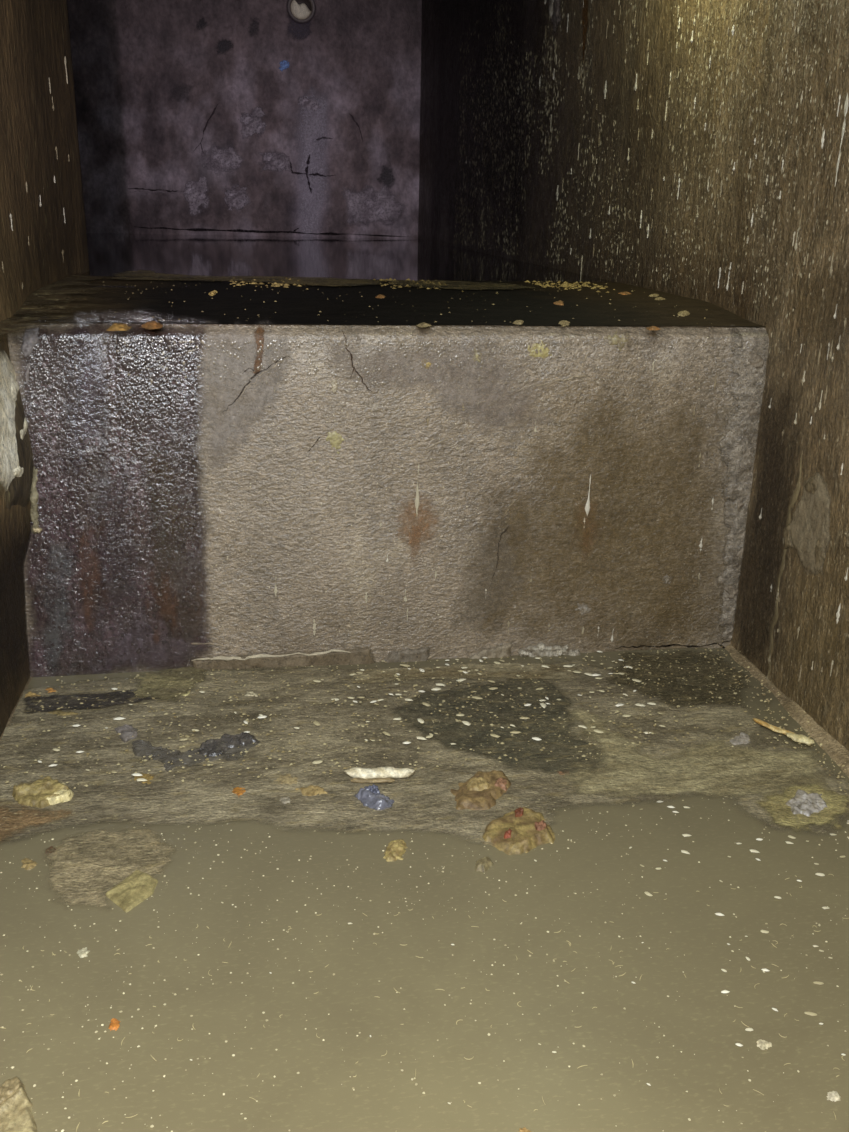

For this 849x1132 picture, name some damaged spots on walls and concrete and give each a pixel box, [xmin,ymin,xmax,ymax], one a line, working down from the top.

crack [290,113,363,193]
crack [223,357,289,412]
corrosion [253,327,264,374]
crack [342,331,372,392]
peeling [783,473,830,574]